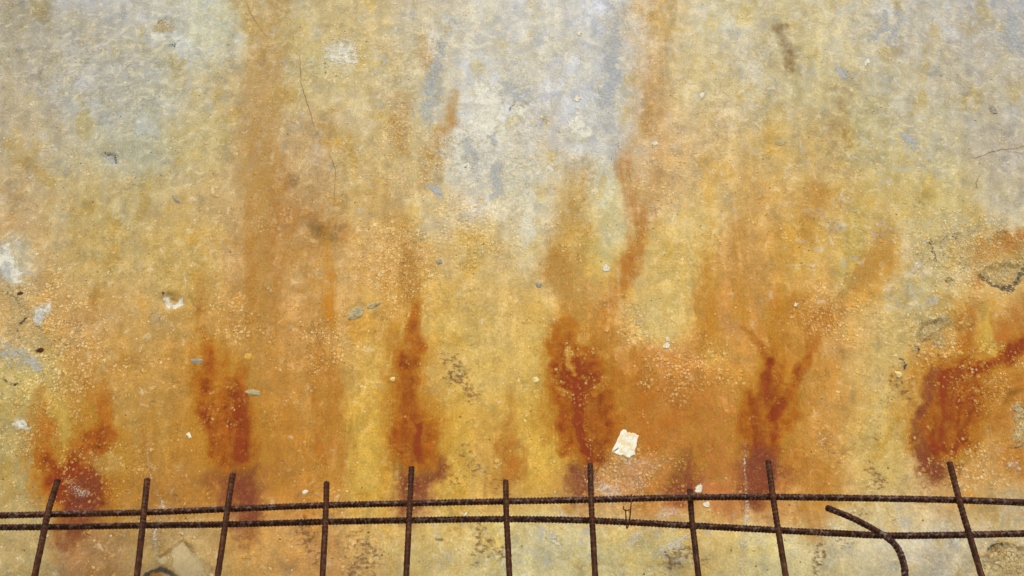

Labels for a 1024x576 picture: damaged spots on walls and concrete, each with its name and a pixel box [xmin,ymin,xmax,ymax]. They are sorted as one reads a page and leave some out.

corrosion [30,396,123,546]
corrosion [190,338,266,537]
corrosion [383,304,448,516]
corrosion [542,206,729,506]
corrosion [736,318,829,529]
corrosion [908,308,1024,482]